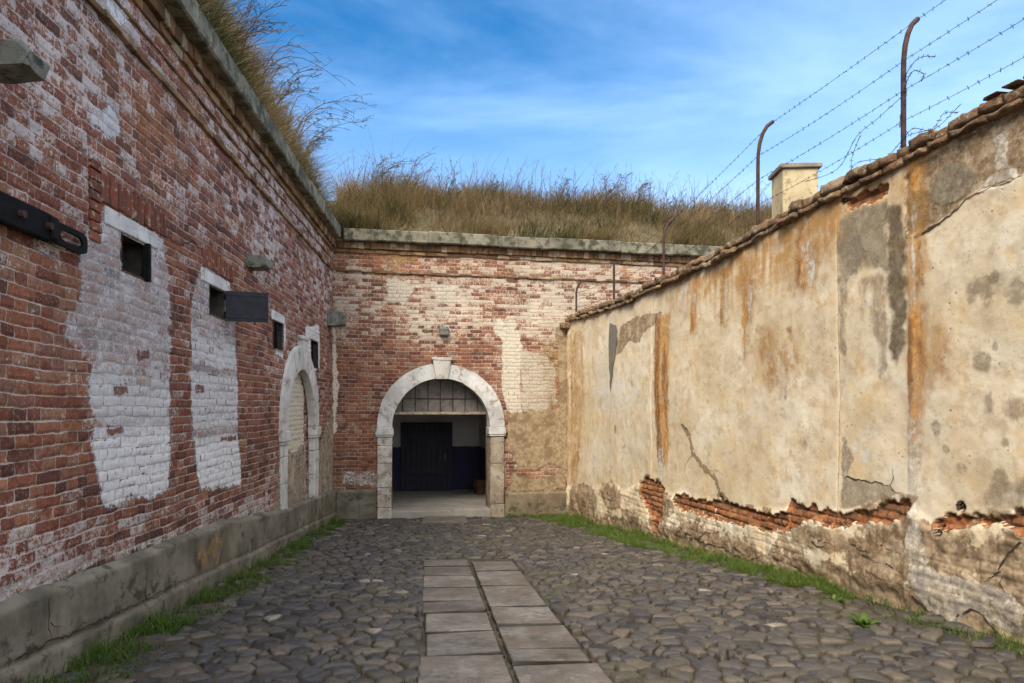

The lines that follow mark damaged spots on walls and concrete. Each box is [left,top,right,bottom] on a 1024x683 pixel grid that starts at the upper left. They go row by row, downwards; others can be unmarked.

flaking render [847,183,889,210]
crack [921,176,1020,235]
leakage [863,274,887,371]
corrosion [907,160,947,505]
corrosion [654,316,669,482]
crack [681,424,728,501]
flaking render [569,474,918,598]
flaking render [931,506,1024,538]
crack [985,542,1021,593]